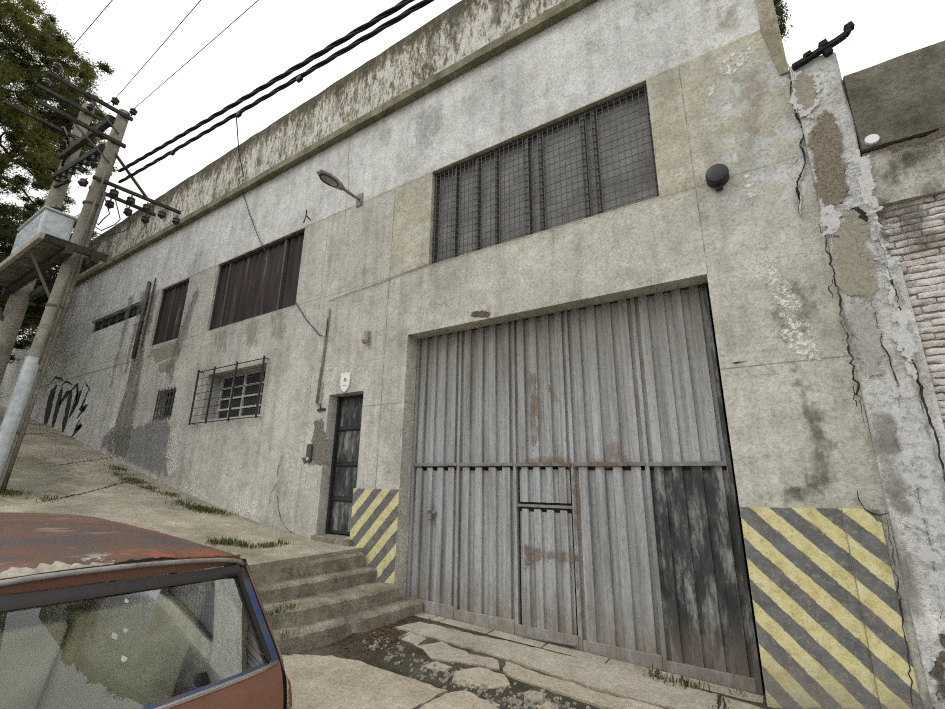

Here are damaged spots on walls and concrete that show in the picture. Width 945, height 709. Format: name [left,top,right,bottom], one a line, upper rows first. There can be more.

crack [787,63,866,427]
flaking render [789,70,886,376]
leakage [803,410,828,492]
crack [857,214,945,706]
flaking render [928,634,945,709]